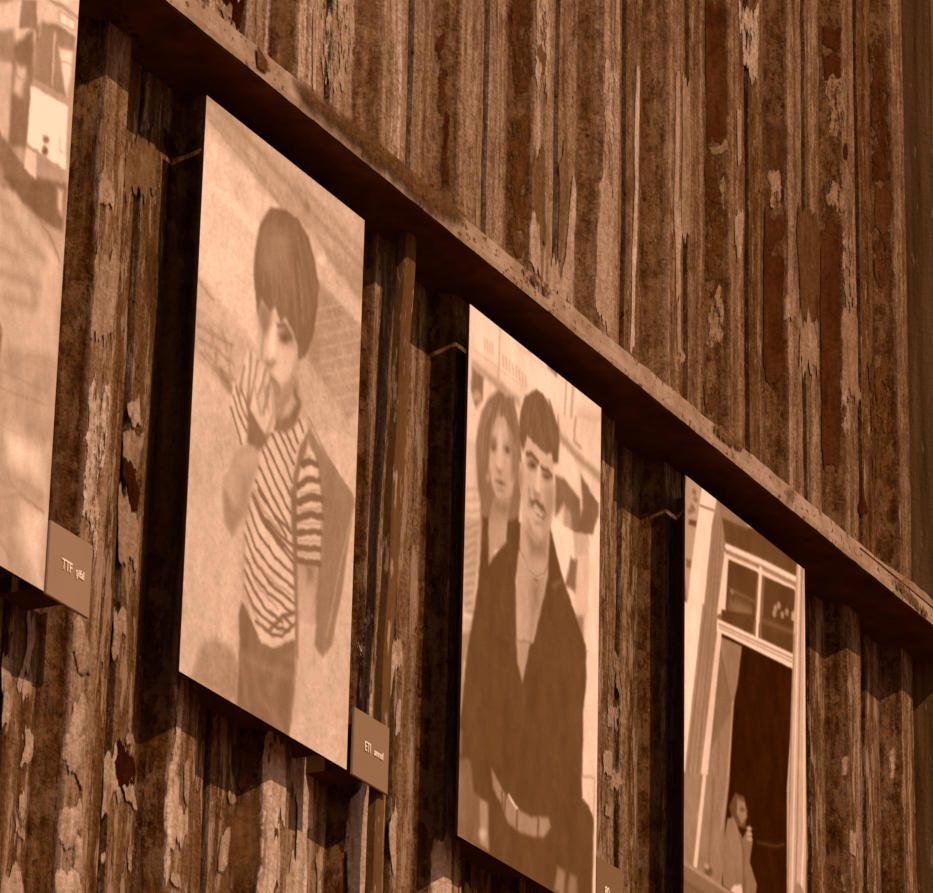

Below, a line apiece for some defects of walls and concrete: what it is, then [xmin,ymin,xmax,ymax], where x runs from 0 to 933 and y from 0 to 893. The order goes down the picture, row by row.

peeling [529,138,576,306]
peeling [594,55,618,335]
peeling [784,289,819,377]
peeling [840,231,862,436]
peeling [1,610,36,727]
peeling [0,861,24,893]
peeling [21,727,34,767]
peeling [102,733,138,817]
peeling [164,678,189,888]
peeling [257,731,323,893]
peeling [345,783,369,893]
peeling [389,801,397,876]